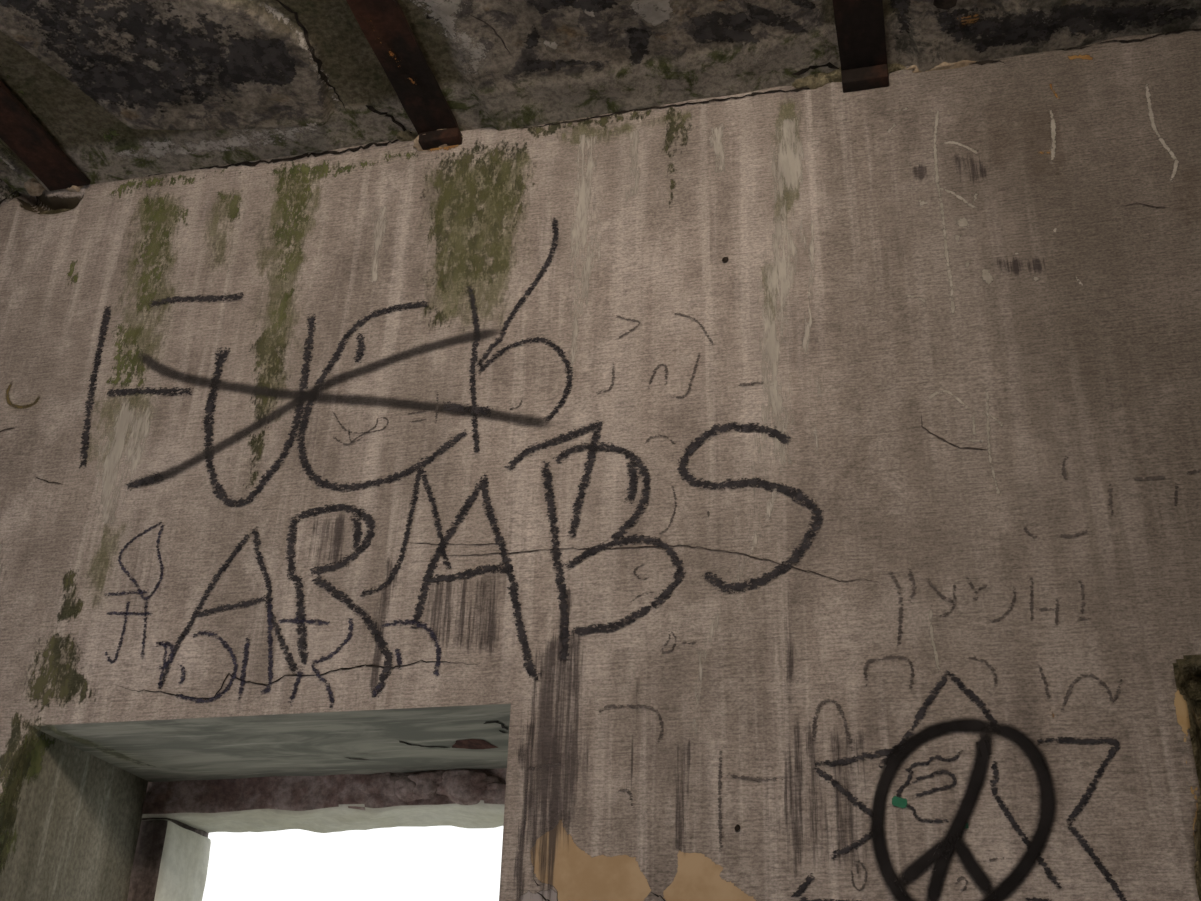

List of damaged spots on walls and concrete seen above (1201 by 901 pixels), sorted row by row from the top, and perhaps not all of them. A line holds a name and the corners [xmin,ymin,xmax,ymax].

water stain [371,206,386,283]
water stain [421,109,651,369]
water stain [662,107,691,207]
water stain [243,431,265,490]
water stain [0,402,150,871]
flaking render [1173,654,1201,901]